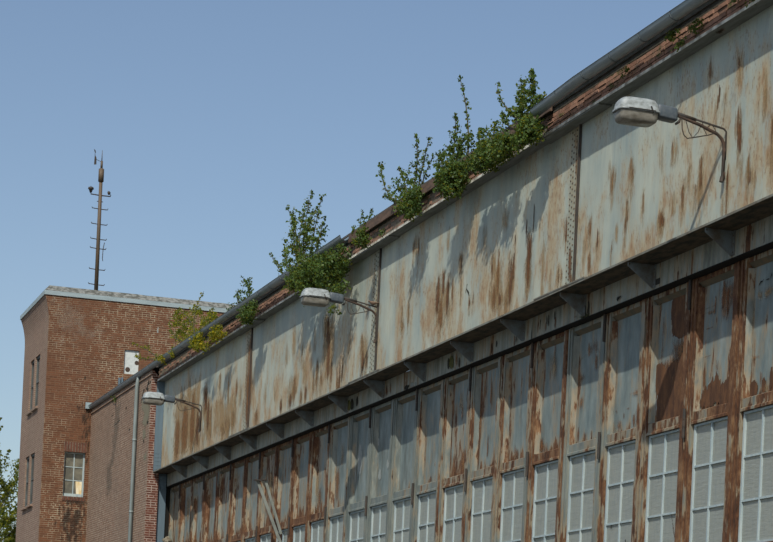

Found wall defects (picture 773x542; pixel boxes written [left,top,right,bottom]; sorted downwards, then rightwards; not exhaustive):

rust [672,156,702,215]
rust [735,108,756,191]
rust [436,273,473,329]
rust [491,254,515,314]
rust [525,207,535,292]
rust [557,222,572,287]
rust [174,337,257,458]
rust [280,315,350,413]